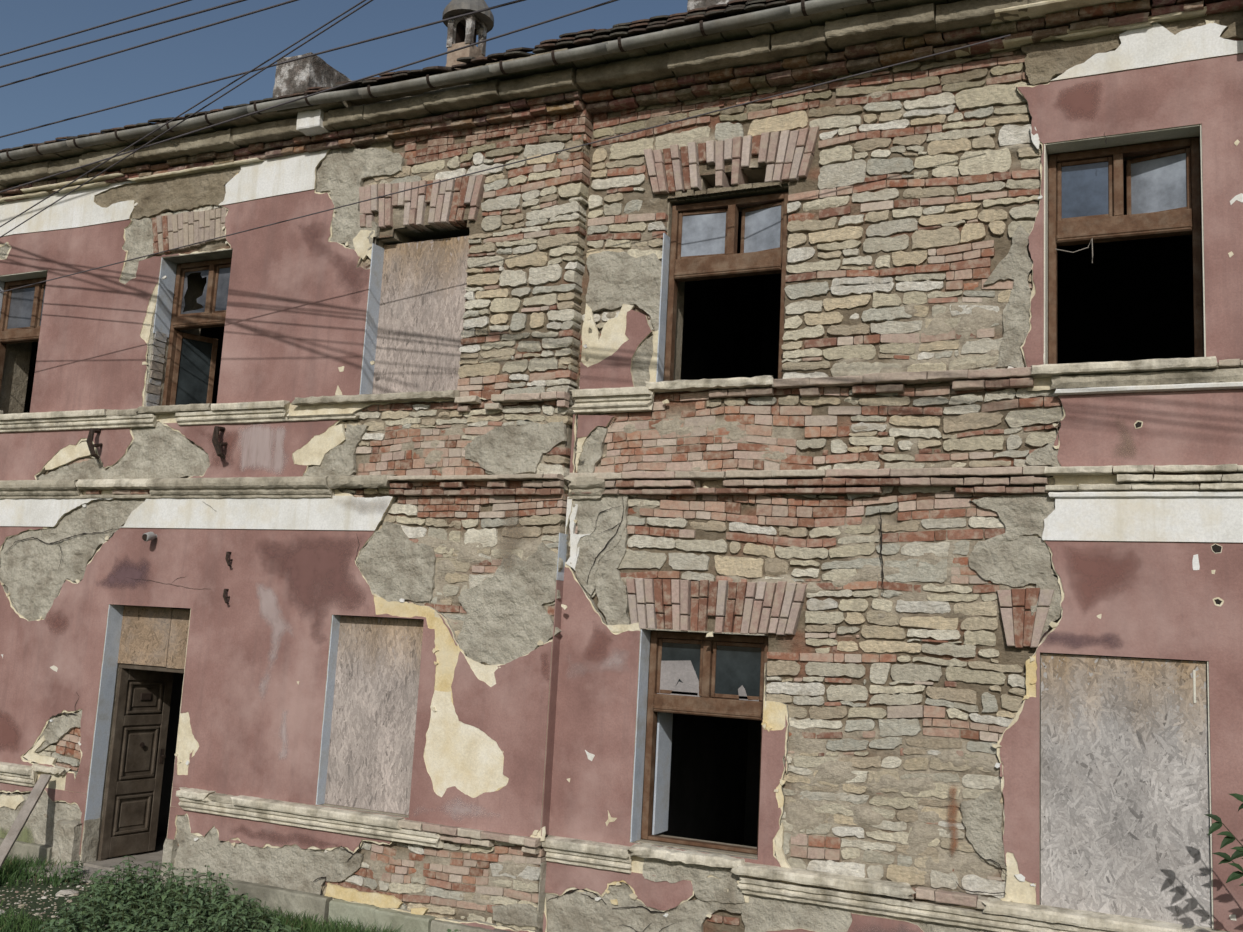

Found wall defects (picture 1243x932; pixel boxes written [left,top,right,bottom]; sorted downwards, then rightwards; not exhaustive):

spalling [1160,1,1243,41]
spalling [38,421,210,480]
spalling [293,32,1124,905]
spalling [0,499,146,621]
spalling [22,710,82,771]
peeling [175,712,199,775]
spalling [0,790,82,846]
spalling [174,815,994,932]